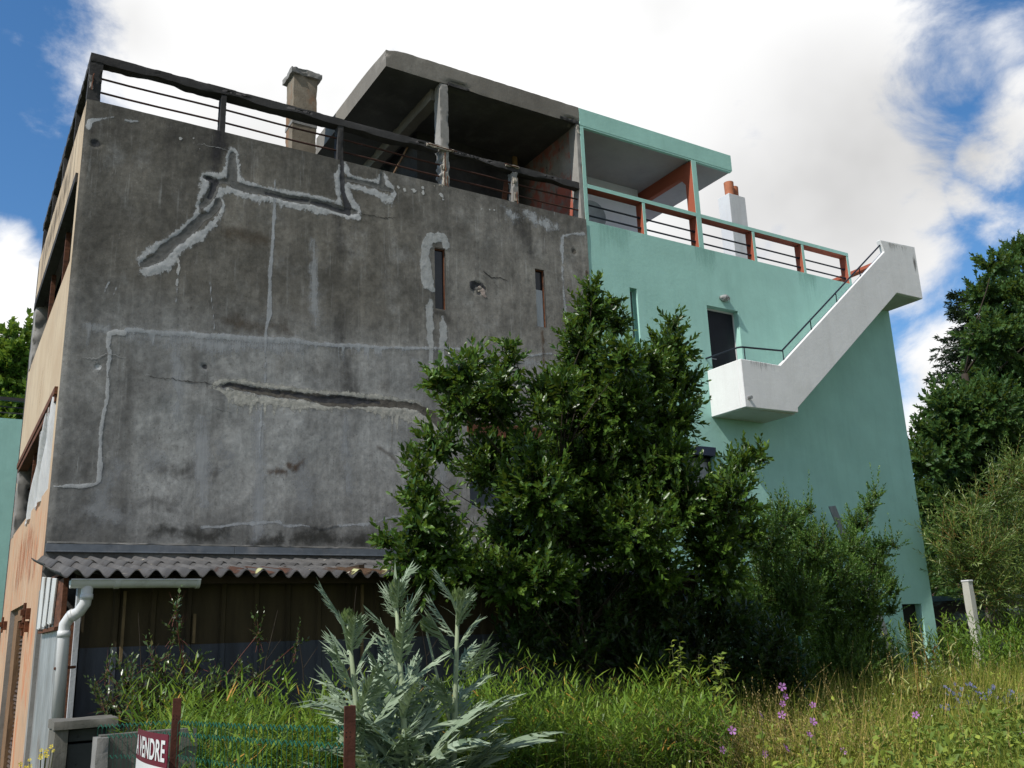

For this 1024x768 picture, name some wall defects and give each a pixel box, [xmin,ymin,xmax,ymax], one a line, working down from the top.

crack [137,143,397,276]
spalling [470,281,487,298]
crack [150,376,449,437]